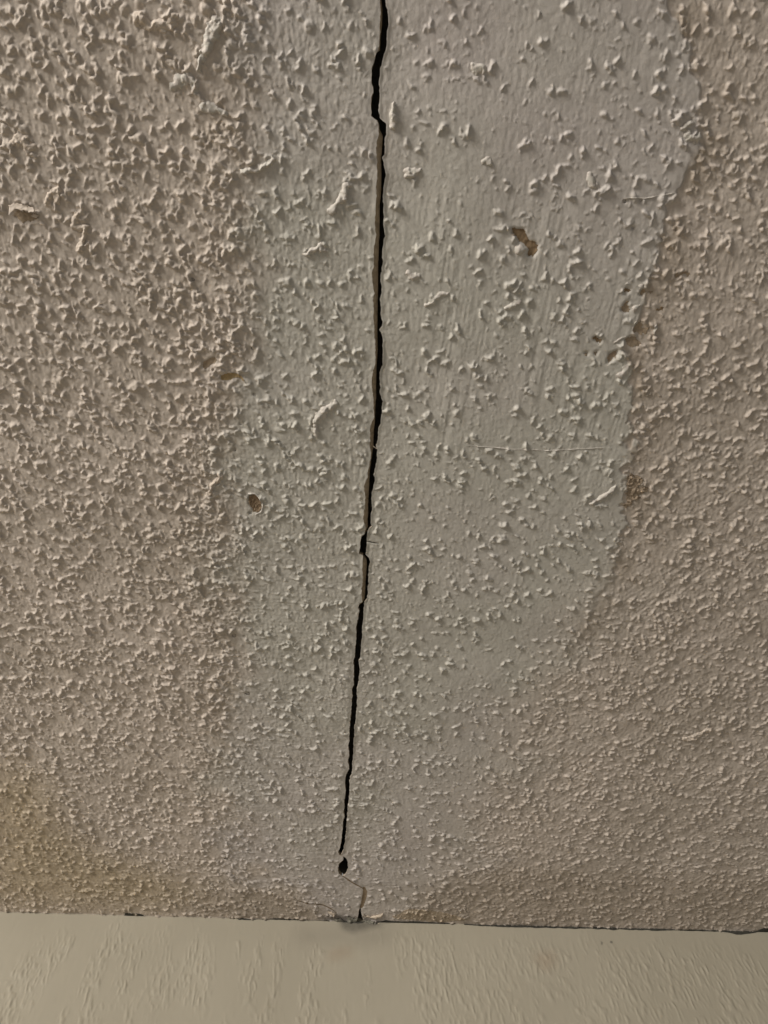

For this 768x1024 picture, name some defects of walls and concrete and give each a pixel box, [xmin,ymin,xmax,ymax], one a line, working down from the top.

crack [238,0,768,935]